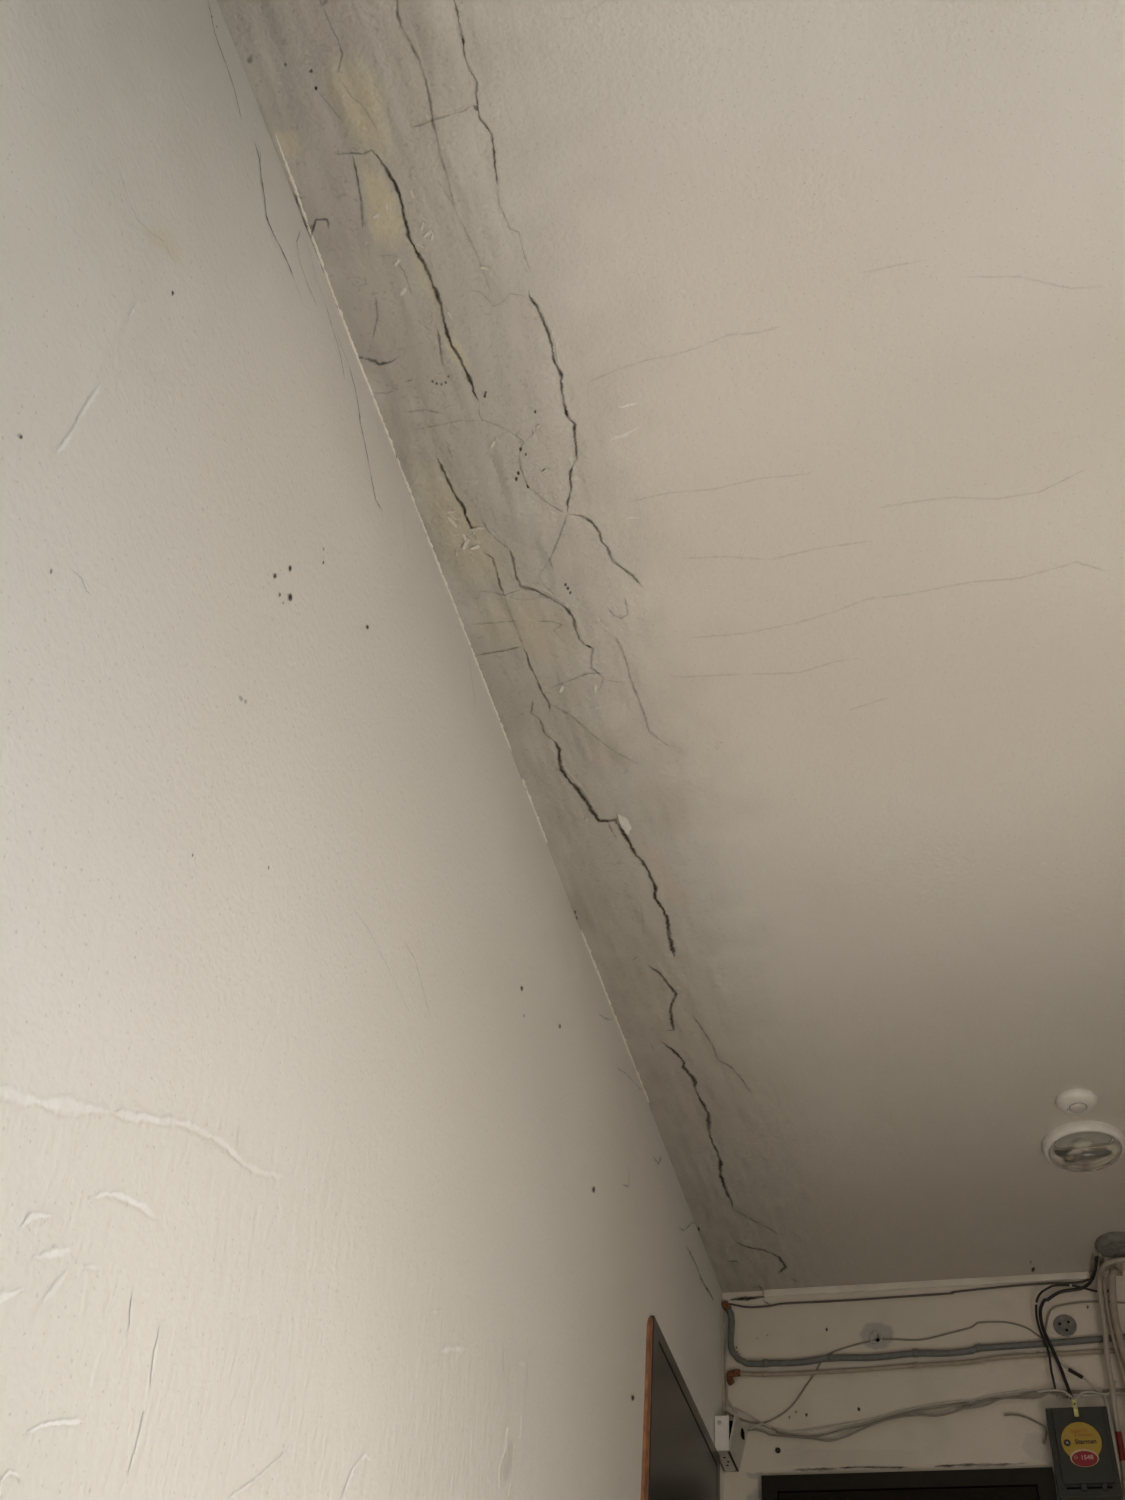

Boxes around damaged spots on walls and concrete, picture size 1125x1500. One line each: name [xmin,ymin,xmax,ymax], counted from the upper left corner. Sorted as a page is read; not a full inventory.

crack [409,1,497,181]
crack [381,161,479,402]
crack [437,458,472,529]
crack [529,295,639,583]
crack [498,554,591,648]
crack [556,743,733,1206]
crack [688,1225,786,1300]